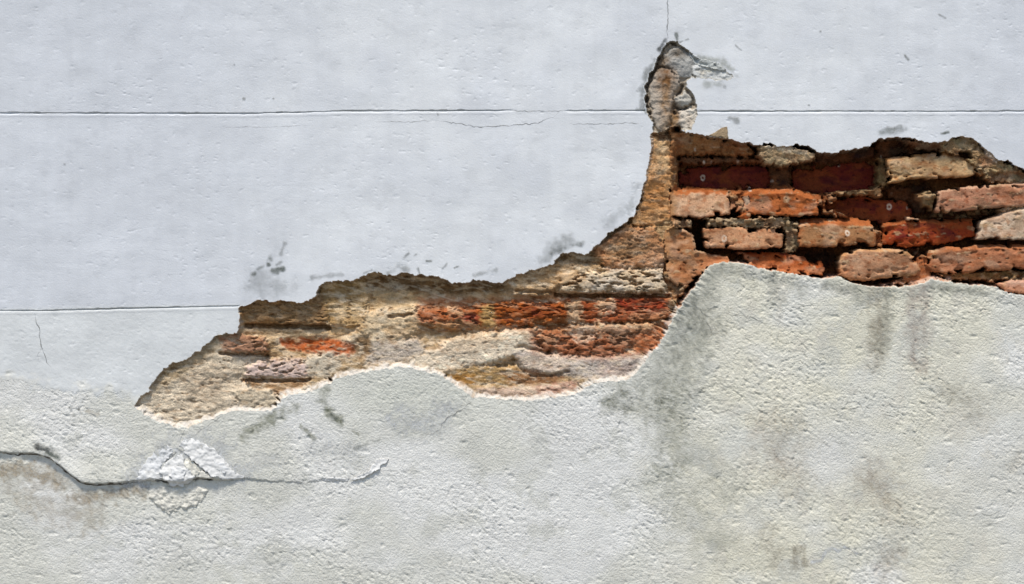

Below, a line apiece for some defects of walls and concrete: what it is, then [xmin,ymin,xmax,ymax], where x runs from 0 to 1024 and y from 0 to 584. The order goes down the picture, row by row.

flaking render [134,41,1024,428]
crack [4,436,213,486]